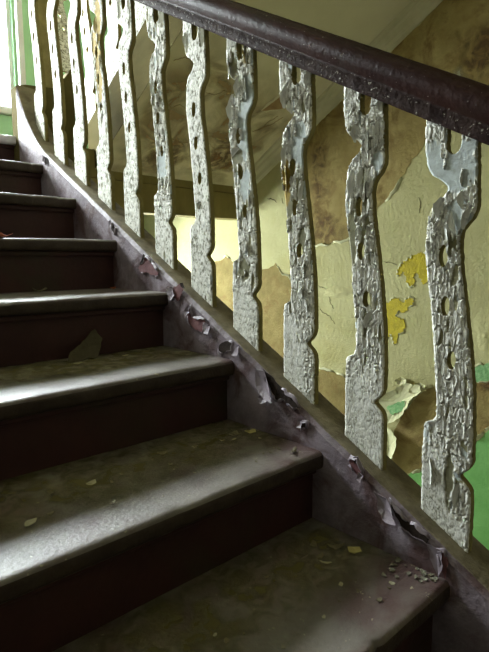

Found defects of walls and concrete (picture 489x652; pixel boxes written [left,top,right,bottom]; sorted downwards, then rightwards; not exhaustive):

peeling [390,0,489,85]
peeling [298,100,368,248]
peeling [376,104,427,209]
peeling [184,304,210,335]
spalling [215,254,234,311]
peeling [217,340,239,356]
spalling [257,263,292,358]
peeling [255,369,300,410]
spalling [318,367,346,416]
peeling [379,377,437,484]
peeling [476,381,489,441]
peeling [374,491,449,579]